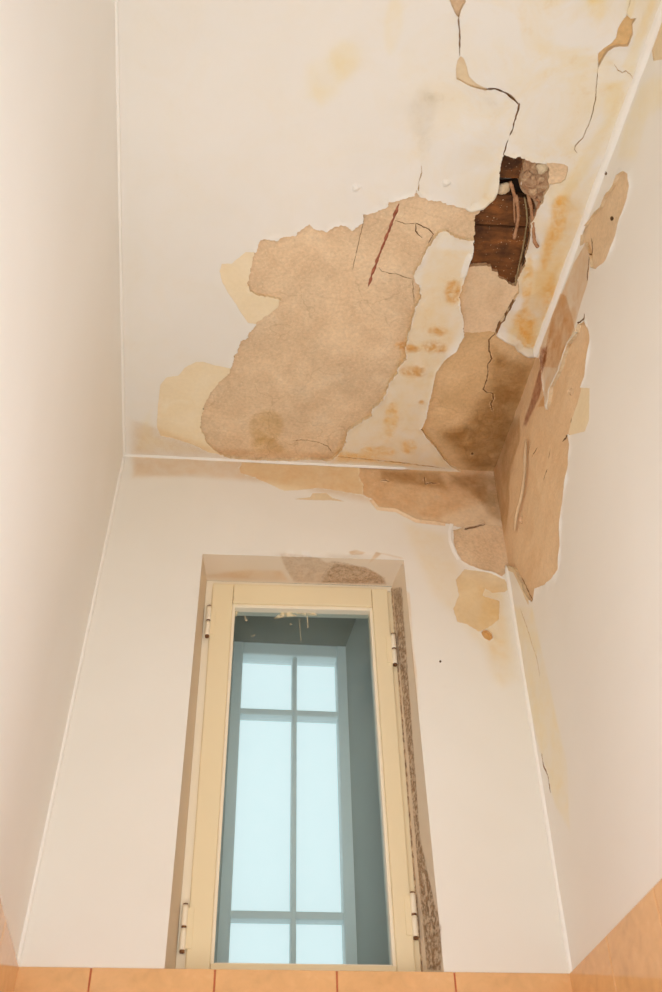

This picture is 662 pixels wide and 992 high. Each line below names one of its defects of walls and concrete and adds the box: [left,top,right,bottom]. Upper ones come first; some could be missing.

crack [486,88,520,153]
crack [574,64,632,150]
spalling [580,171,629,269]
spalling [157,159,590,641]